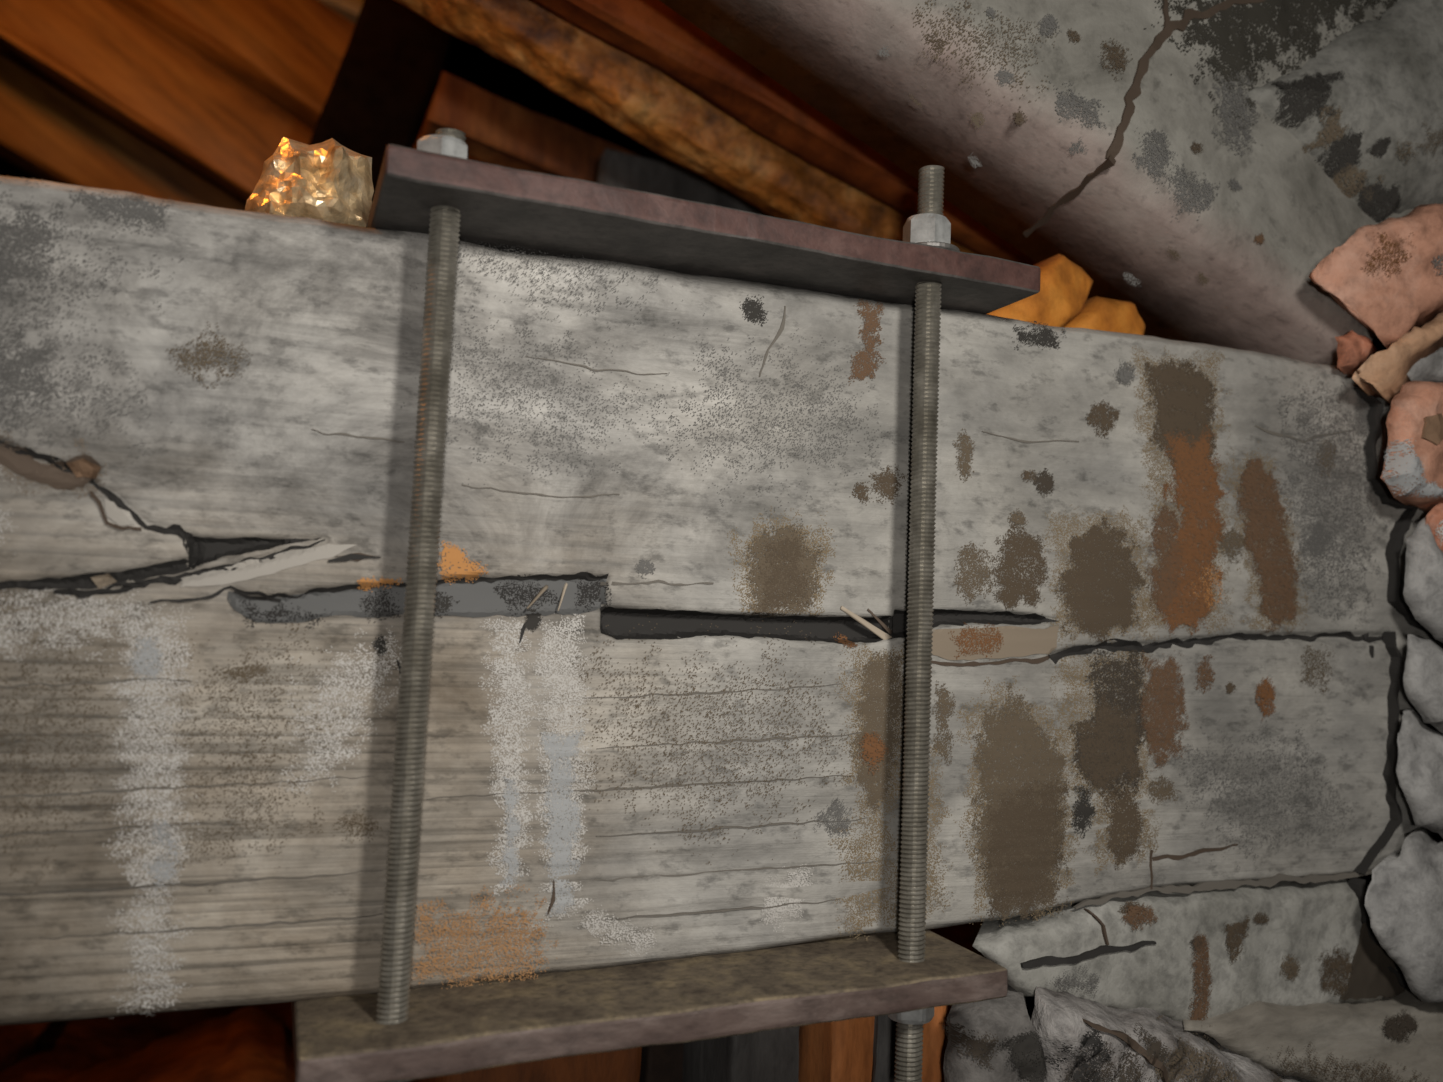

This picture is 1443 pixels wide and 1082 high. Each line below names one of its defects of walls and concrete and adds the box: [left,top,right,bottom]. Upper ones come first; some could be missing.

crack [1023,0,1265,238]
damp [0,175,184,463]
damp [167,322,253,389]
crack [525,356,668,375]
crack [759,306,786,377]
damp [0,588,402,1019]
damp [433,592,460,618]
crack [0,385,1431,987]
rust [1137,425,1300,771]